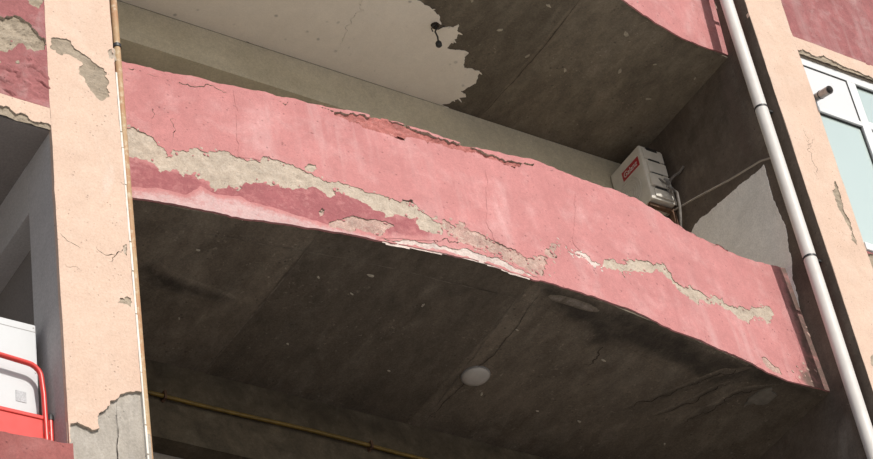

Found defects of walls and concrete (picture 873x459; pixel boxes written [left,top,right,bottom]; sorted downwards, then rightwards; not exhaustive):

spalling [0,16,109,101]
peeling [419,0,725,163]
spalling [0,107,50,130]
spalling [334,113,530,167]
spalling [127,124,774,324]
spalling [833,182,856,244]
crack [624,364,757,409]
spalling [67,393,152,459]